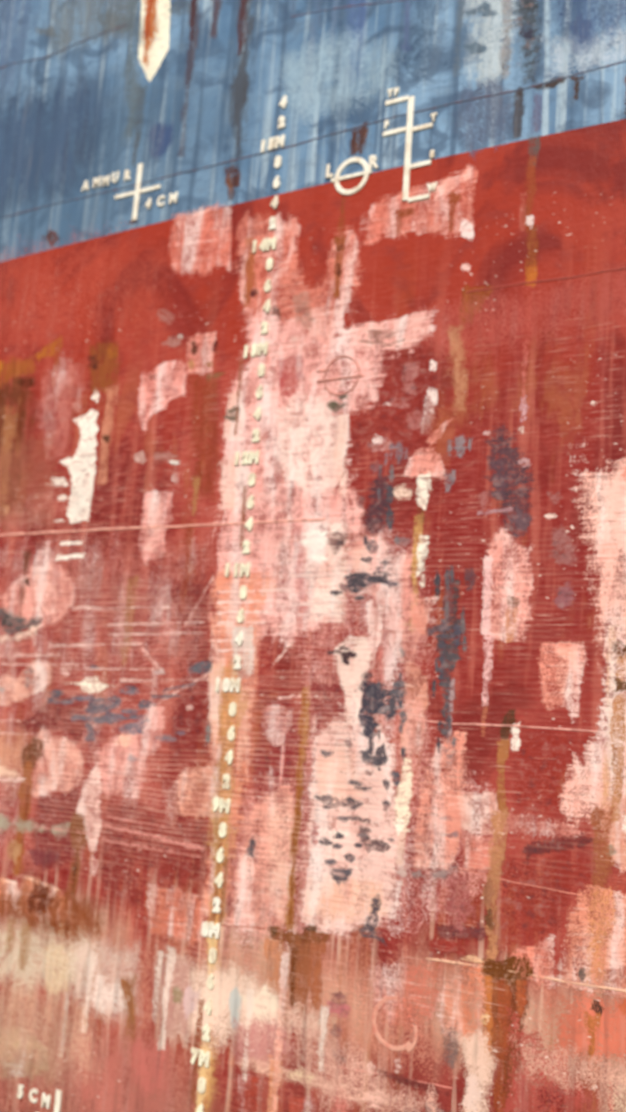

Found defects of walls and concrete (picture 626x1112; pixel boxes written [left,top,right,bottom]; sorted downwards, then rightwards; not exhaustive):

corrosion [518,133,541,287]
corrosion [87,337,121,486]
peeling [0,164,626,959]
peeling [225,935,317,1112]
corrosion [263,686,331,1014]
peeling [327,991,351,1064]
peeling [436,954,491,1044]
corrosion [475,709,539,1112]
peeling [510,884,626,1003]